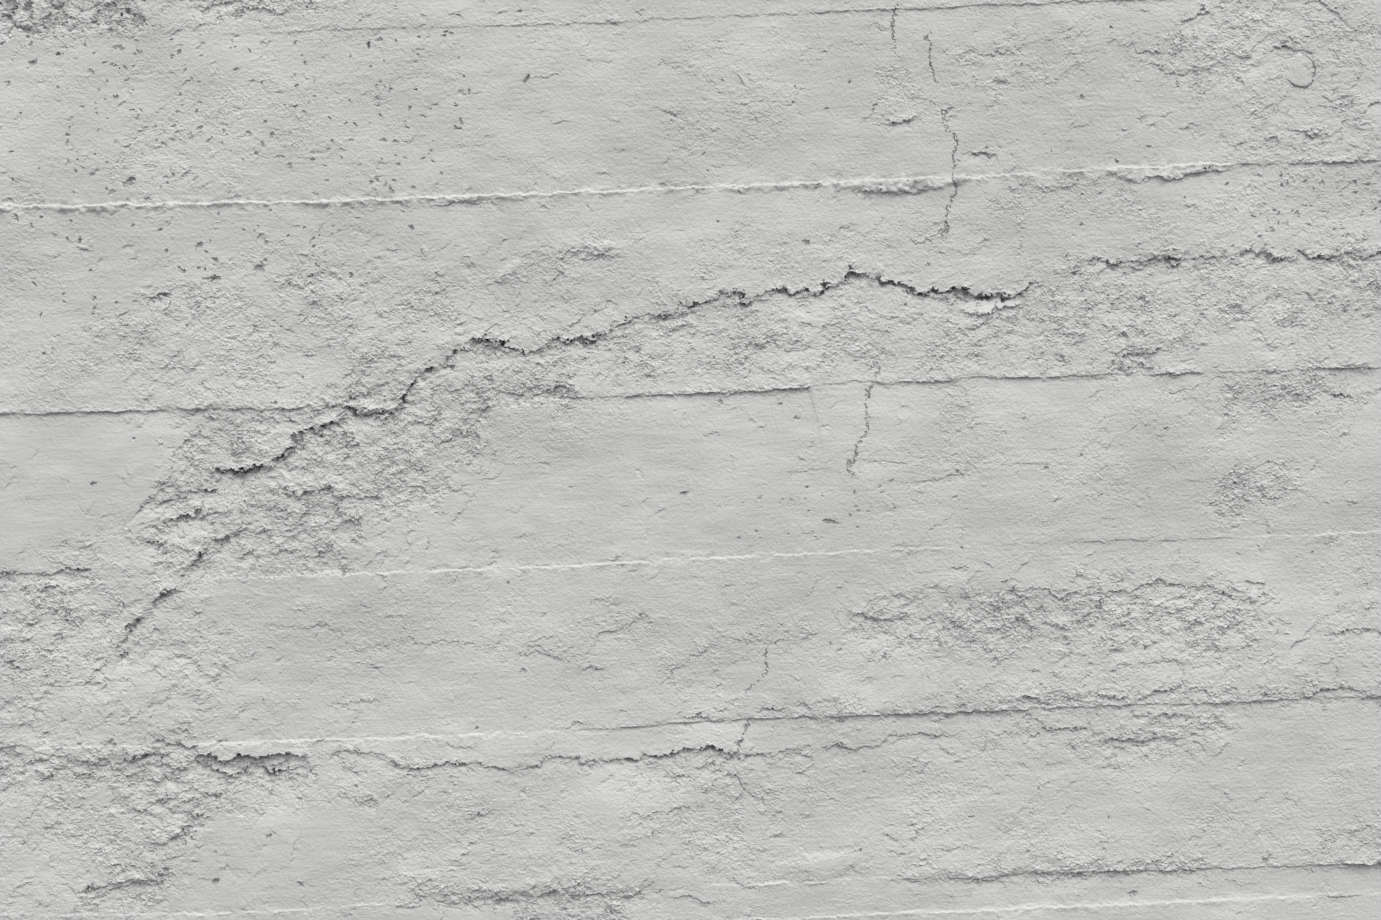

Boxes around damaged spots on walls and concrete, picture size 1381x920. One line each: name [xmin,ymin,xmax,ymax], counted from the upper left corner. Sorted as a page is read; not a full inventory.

spalling [0,0,156,54]
spalling [178,0,335,25]
crack [30,246,1381,691]
crack [140,694,172,712]